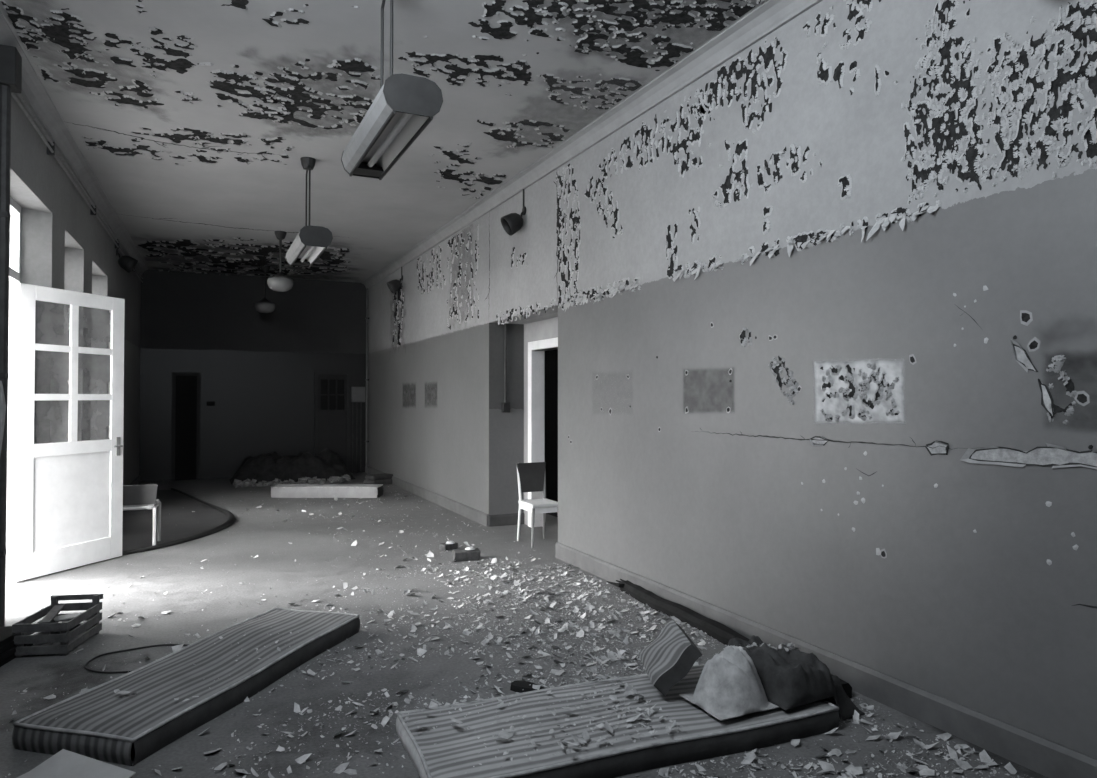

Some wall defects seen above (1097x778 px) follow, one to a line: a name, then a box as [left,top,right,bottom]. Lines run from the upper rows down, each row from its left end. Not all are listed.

peeling [0,0,386,130]
peeling [398,0,765,111]
peeling [81,127,295,166]
peeling [477,119,570,148]
peeling [496,0,1097,325]
peeling [136,237,355,276]
peeling [392,277,404,347]
peeling [416,224,480,330]
peeling [768,356,802,405]
peeling [820,363,900,423]
peeling [1011,310,1090,425]
crack [695,428,968,476]